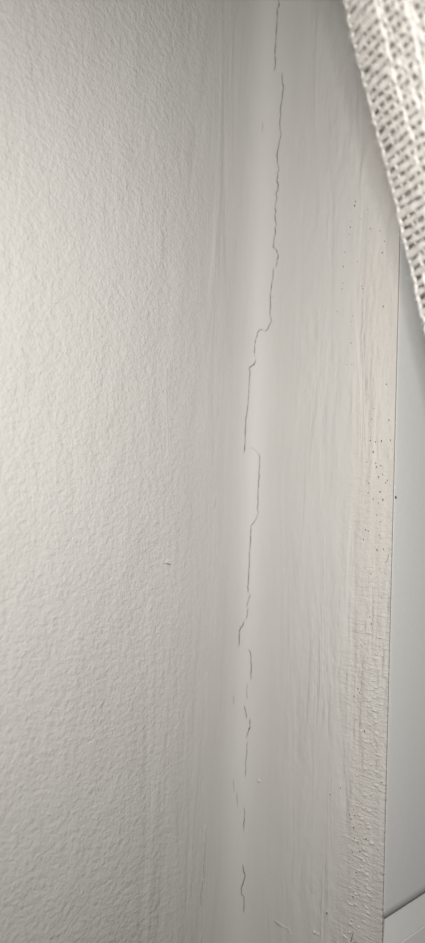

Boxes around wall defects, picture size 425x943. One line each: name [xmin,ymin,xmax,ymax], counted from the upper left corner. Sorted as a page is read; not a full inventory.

crack [233,1,284,826]